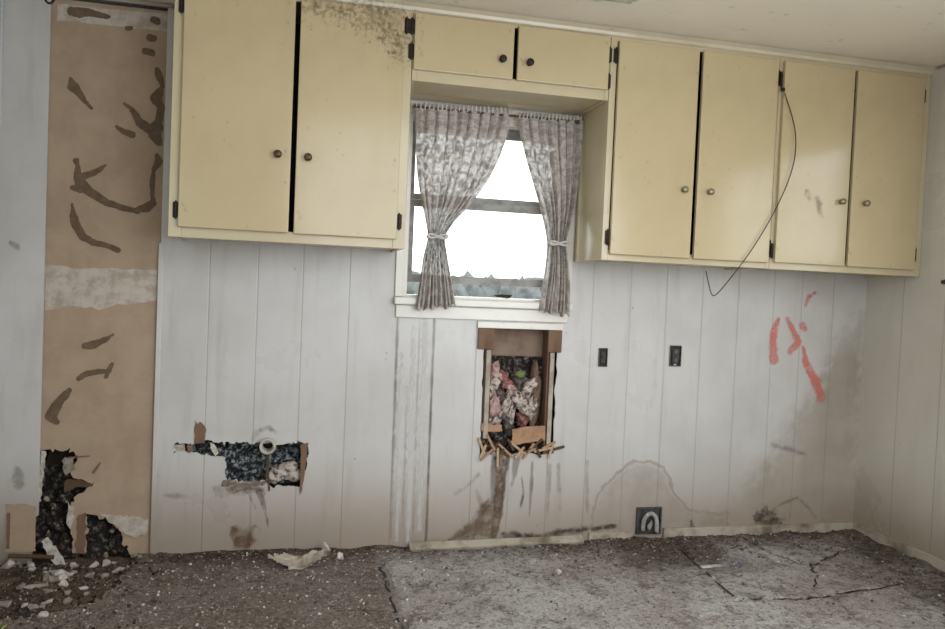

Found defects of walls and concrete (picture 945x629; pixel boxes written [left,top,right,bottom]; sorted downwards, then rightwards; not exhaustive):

spalling [477,321,565,467]
spalling [5,451,149,565]
spalling [173,421,309,494]
leakage [460,452,540,539]
leakage [554,524,616,535]
crack [680,537,902,601]